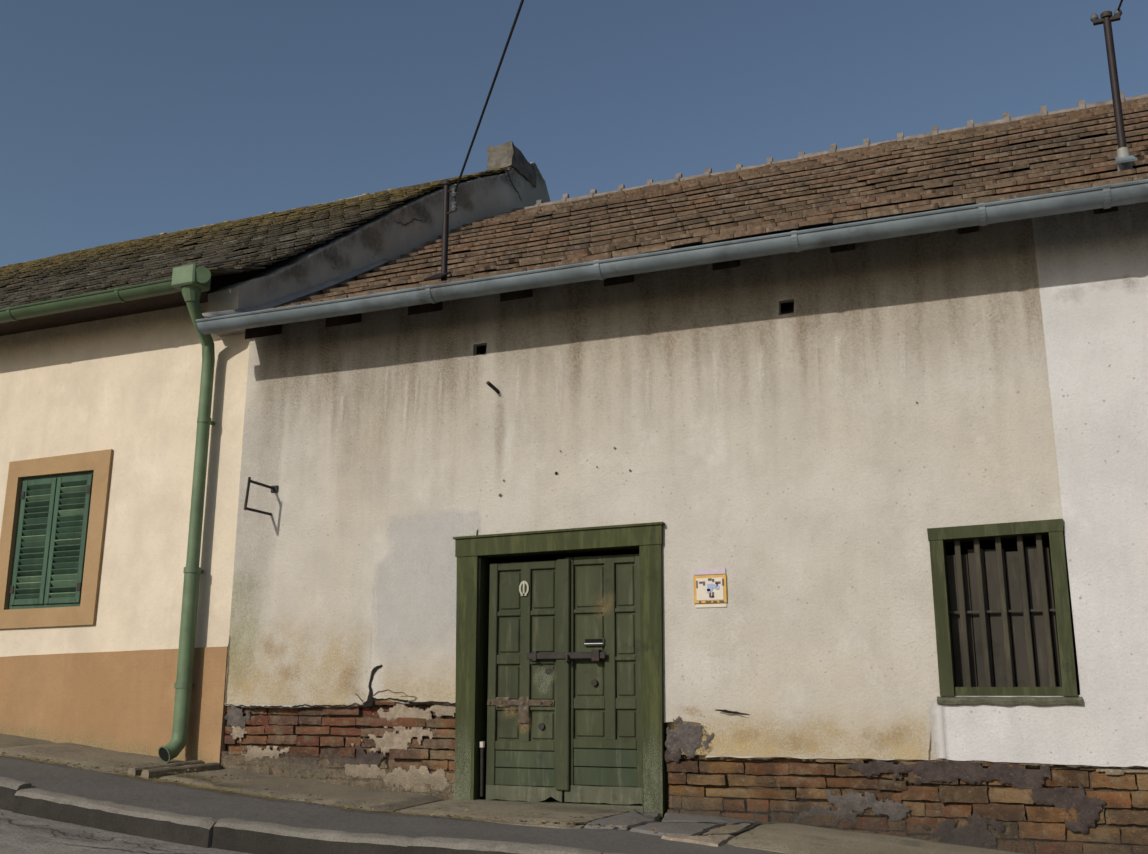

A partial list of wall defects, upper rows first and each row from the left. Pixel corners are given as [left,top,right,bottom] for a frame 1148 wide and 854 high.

damp [314,649,355,705]
crack [224,636,455,709]
spalling [224,700,471,800]
spalling [643,716,1148,812]